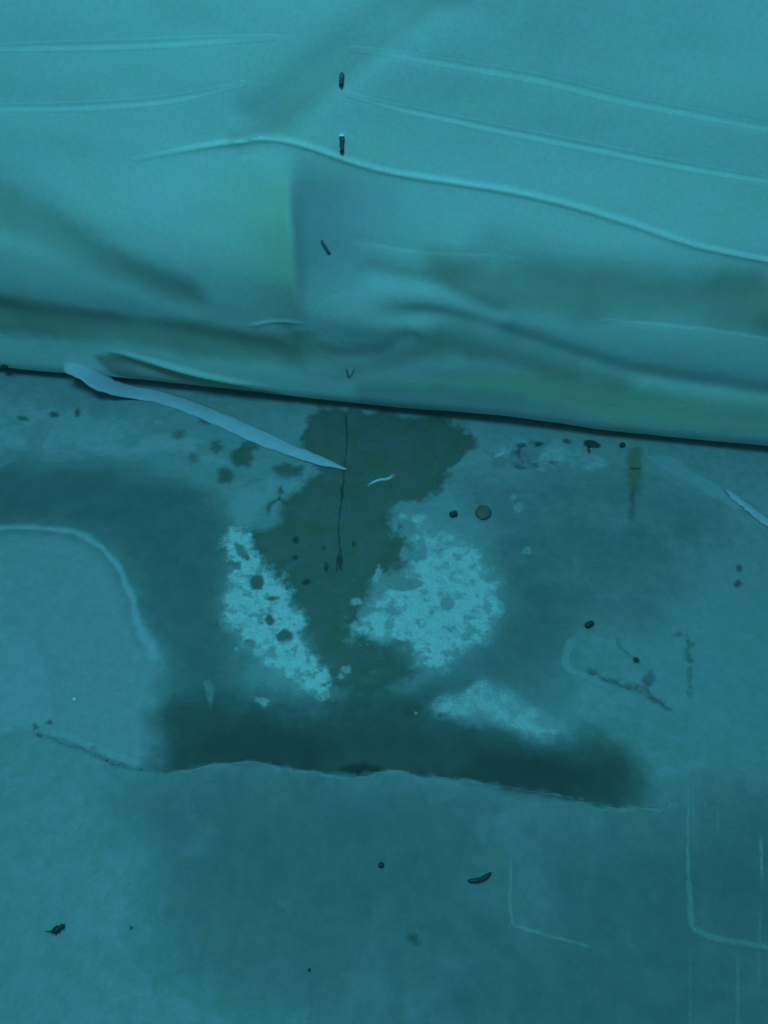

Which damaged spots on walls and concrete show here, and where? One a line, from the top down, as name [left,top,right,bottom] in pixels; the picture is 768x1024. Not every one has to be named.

peeling [62,362,347,470]
water stain [0,409,629,807]